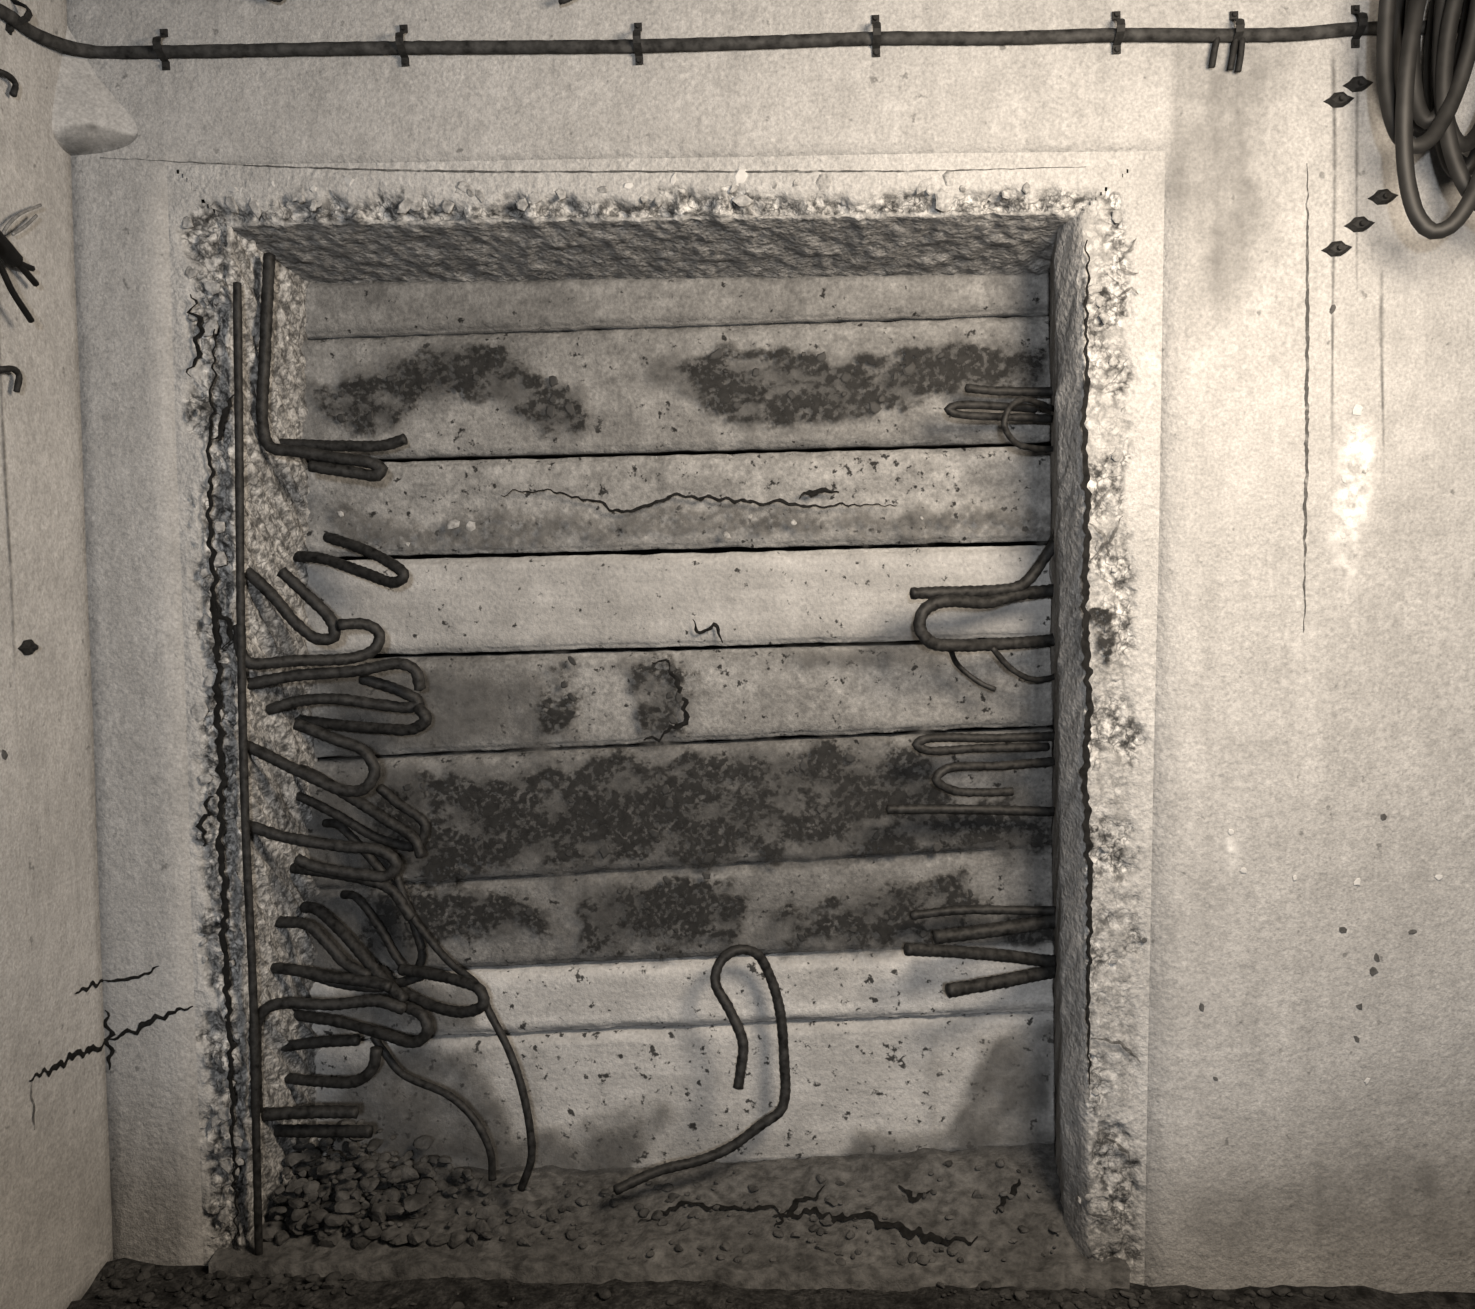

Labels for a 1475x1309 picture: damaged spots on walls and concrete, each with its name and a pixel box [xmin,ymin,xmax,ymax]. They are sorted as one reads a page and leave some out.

crack [501,487,897,513]
water stain [337,673,496,754]
spalling [167,151,1165,1285]
crack [29,294,240,1241]
crack [638,1179,1021,1246]